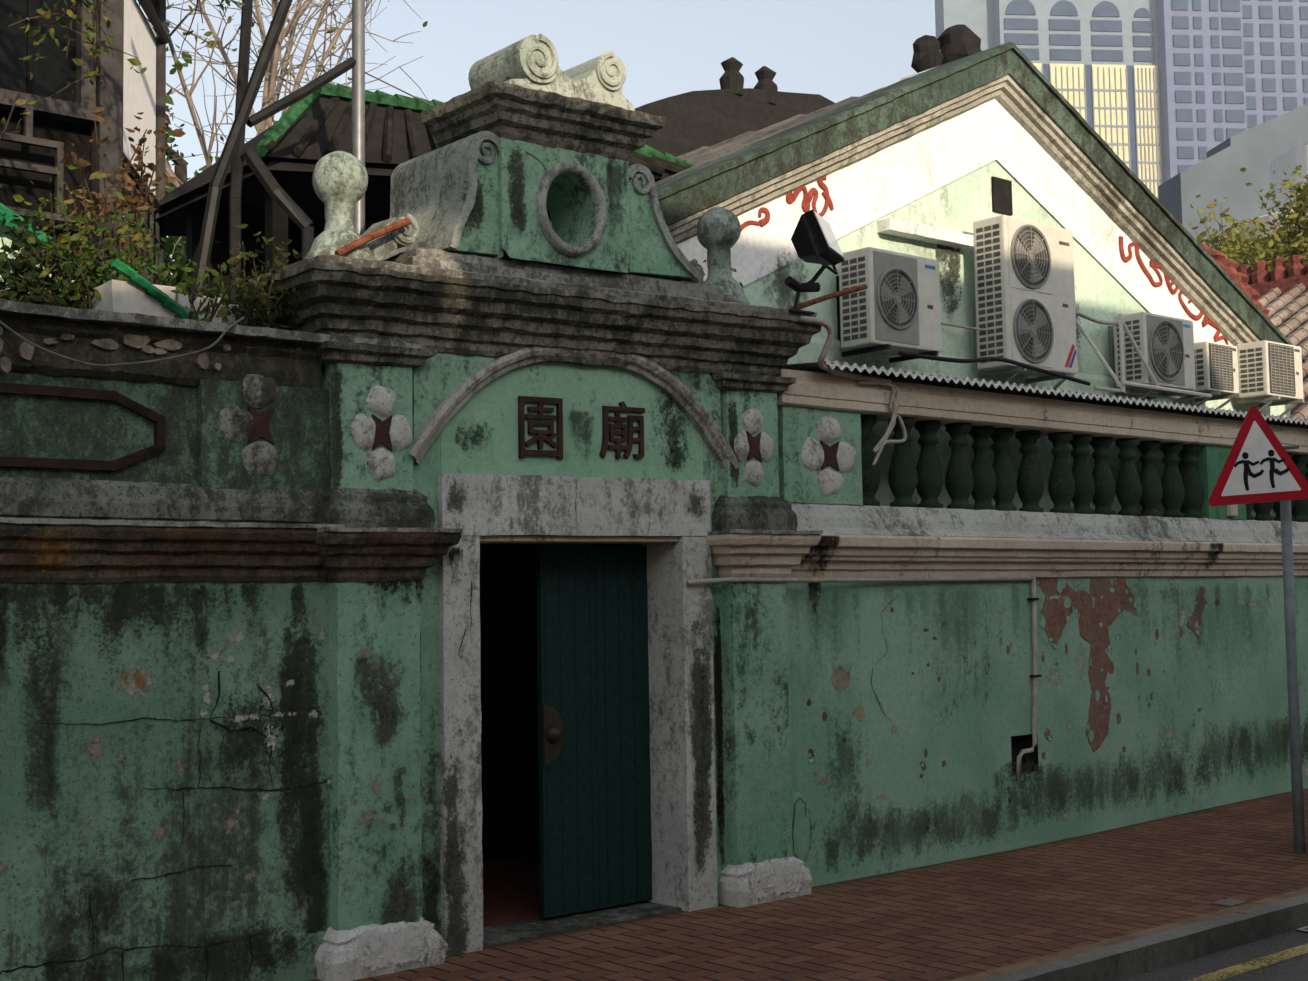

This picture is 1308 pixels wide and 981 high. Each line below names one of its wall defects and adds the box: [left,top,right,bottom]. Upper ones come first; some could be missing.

leakage [0,581,331,981]
crack [41,671,330,881]
leakage [353,636,421,748]
leakage [368,579,424,606]
leakage [379,753,470,957]
leakage [690,606,725,872]
leakage [802,535,840,612]
leakage [827,712,1308,866]
peeling [1037,577,1138,753]
peeling [1180,582,1220,644]
crack [0,893,263,981]